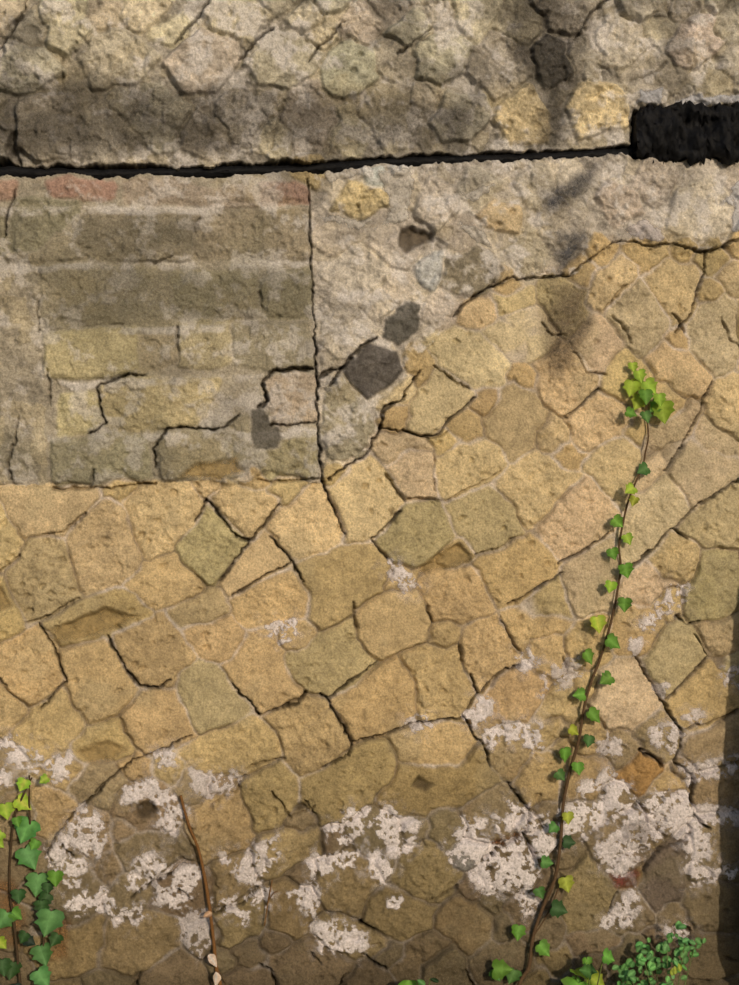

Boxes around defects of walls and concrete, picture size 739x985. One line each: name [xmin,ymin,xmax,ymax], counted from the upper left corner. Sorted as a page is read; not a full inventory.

flaking render [637,88,663,108]
flaking render [677,94,739,107]
efflorescence [462,696,545,750]
efflorescence [648,709,705,755]
efflorescence [0,733,74,787]
efflorescence [120,778,190,837]
efflorescence [189,767,241,799]
efflorescence [446,754,739,917]
efflorescence [43,802,212,956]
efflorescence [220,835,280,927]
efflorescence [287,805,421,955]
efflorescence [599,889,641,930]